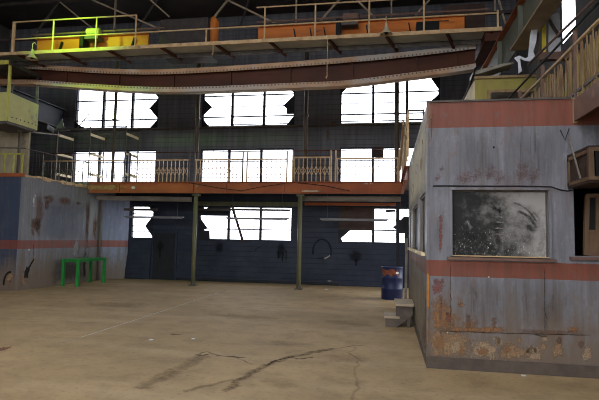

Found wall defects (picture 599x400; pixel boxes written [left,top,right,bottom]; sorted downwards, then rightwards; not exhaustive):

rust [31,196,53,235]
rust [422,272,504,346]
peeling [426,329,563,360]
crack [230,350,328,389]